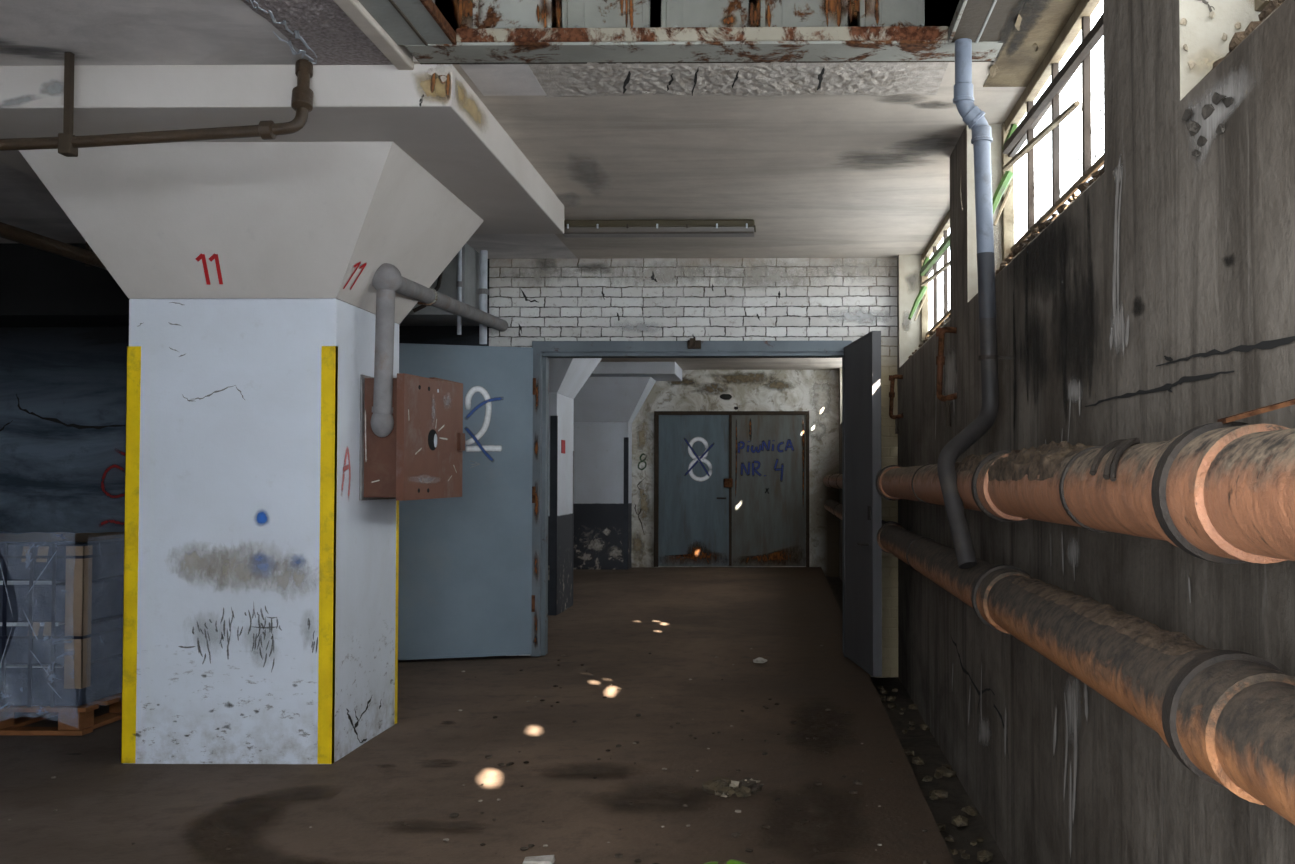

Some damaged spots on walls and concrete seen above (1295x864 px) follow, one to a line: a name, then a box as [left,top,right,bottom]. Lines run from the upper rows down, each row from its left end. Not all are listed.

corrosion [455,0,481,27]
corrosion [537,0,561,28]
corrosion [620,0,633,28]
corrosion [721,0,771,27]
corrosion [822,0,879,27]
corrosion [419,73,482,124]
peeling [1181,76,1244,157]
crack [1085,336,1295,407]
crack [0,394,126,431]
corrosion [664,543,802,565]